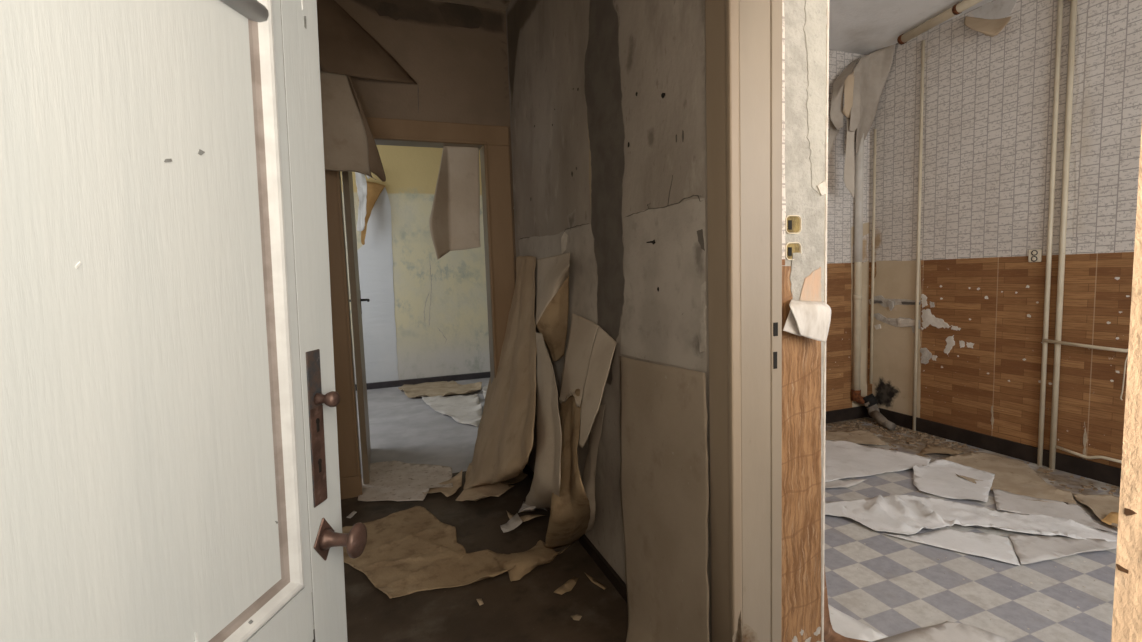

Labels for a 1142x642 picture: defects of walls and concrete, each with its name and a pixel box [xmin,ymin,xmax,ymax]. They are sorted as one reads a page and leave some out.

peeling [301,0,417,84]
peeling [964,16,1012,37]
peeling [803,0,827,196]
spalling [869,285,974,368]